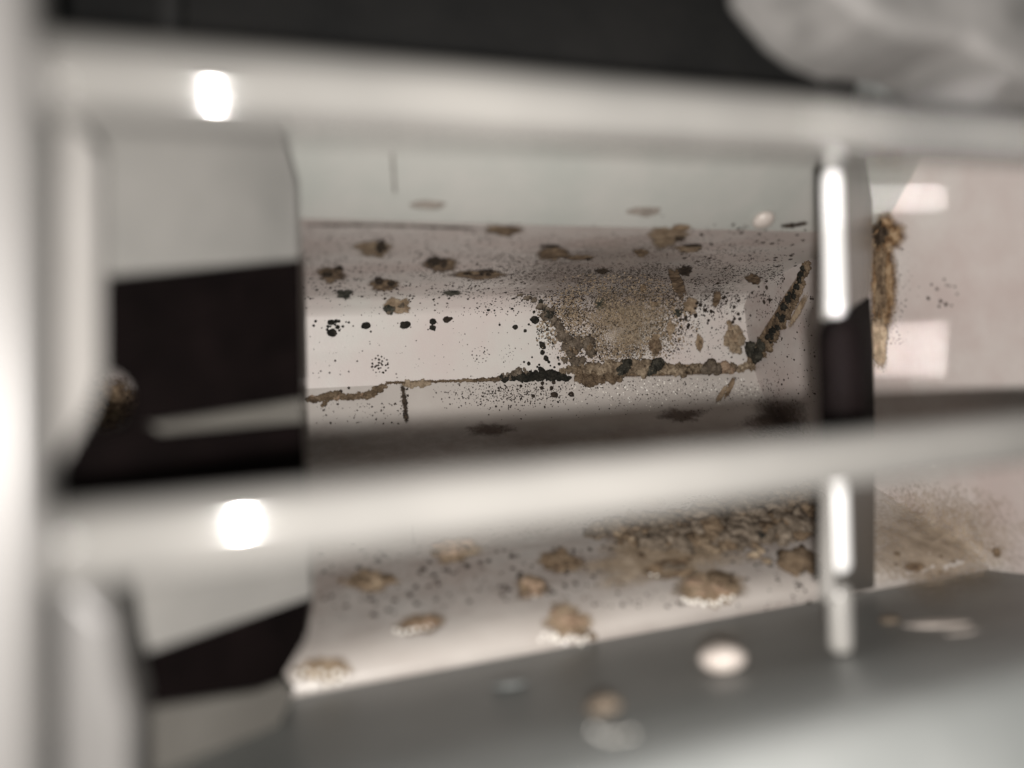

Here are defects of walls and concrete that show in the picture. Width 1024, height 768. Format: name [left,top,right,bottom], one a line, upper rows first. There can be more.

water stain [302,207,816,434]
corrosion [871,244,897,370]
crack [400,385,409,423]